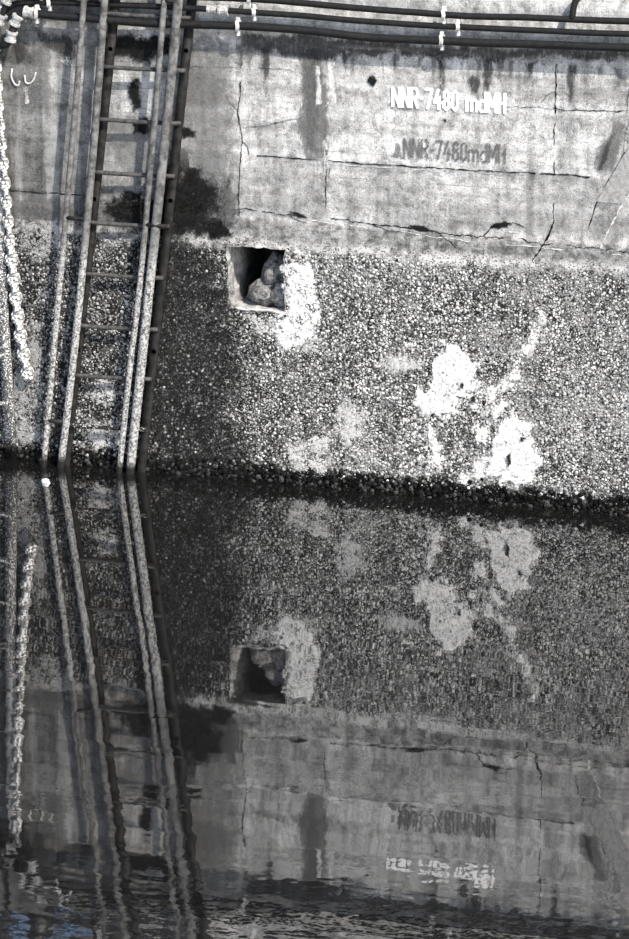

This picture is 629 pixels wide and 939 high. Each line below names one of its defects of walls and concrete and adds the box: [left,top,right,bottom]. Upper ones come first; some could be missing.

crack [152,51,629,262]
leakage [236,31,629,172]